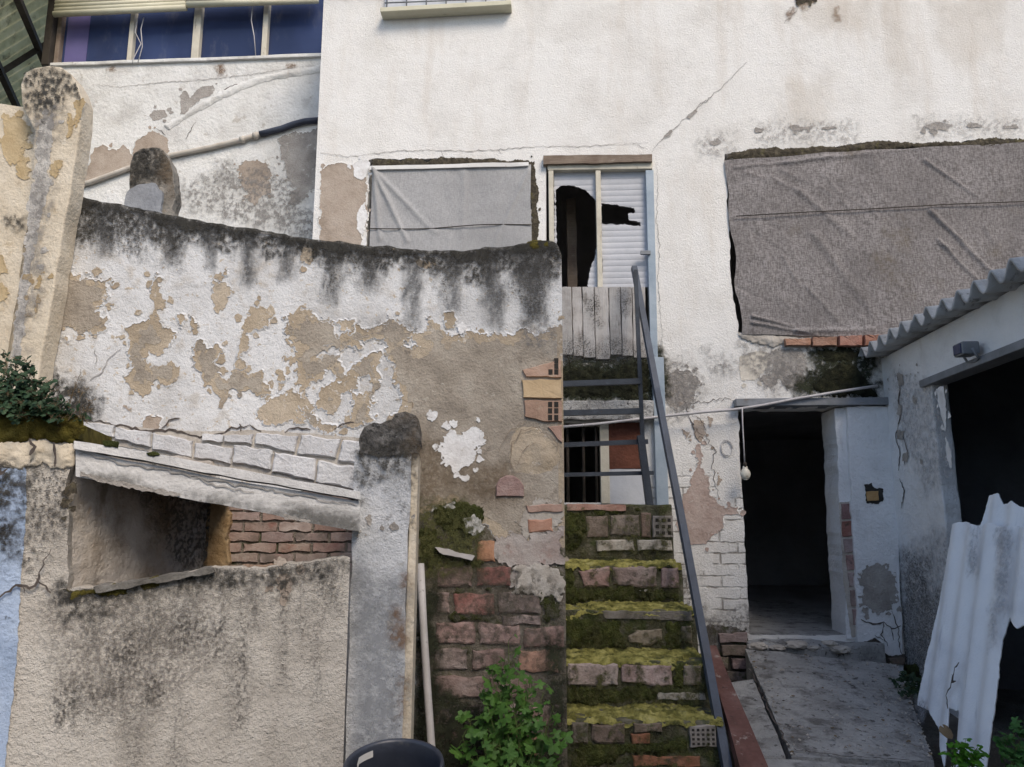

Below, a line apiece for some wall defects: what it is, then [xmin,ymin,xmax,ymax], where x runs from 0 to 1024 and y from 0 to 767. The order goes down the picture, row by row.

peeling [0,98,86,358]
leakage [23,65,81,149]
peeling [85,83,217,183]
peeling [234,127,541,272]
leakage [75,161,701,417]
crack [323,62,747,345]
crack [0,549,51,598]
leakage [50,560,359,726]
peeling [58,266,569,767]
leakage [352,410,505,495]
flaking render [665,365,746,552]
crack [895,375,914,508]